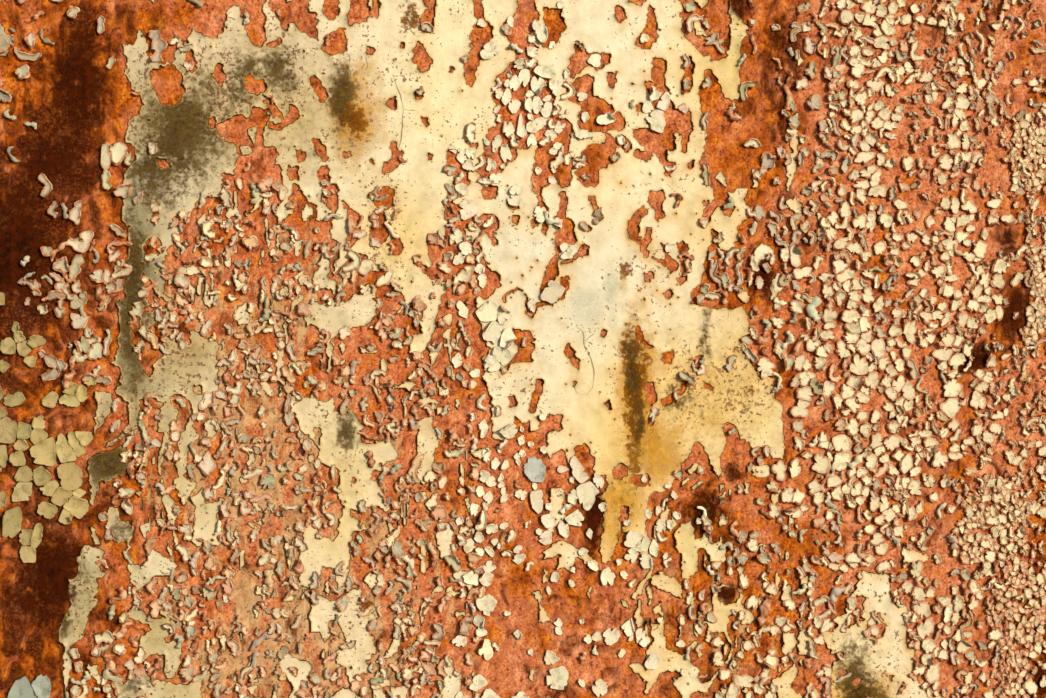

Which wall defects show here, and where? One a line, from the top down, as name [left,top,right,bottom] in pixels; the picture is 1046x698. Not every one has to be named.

rust [0,26,107,314]
peeling [0,0,631,698]
peeling [497,0,1046,698]
rust [681,482,727,529]
rust [725,463,742,481]
rust [0,529,82,625]
rust [718,587,735,603]
rust [1020,650,1046,698]